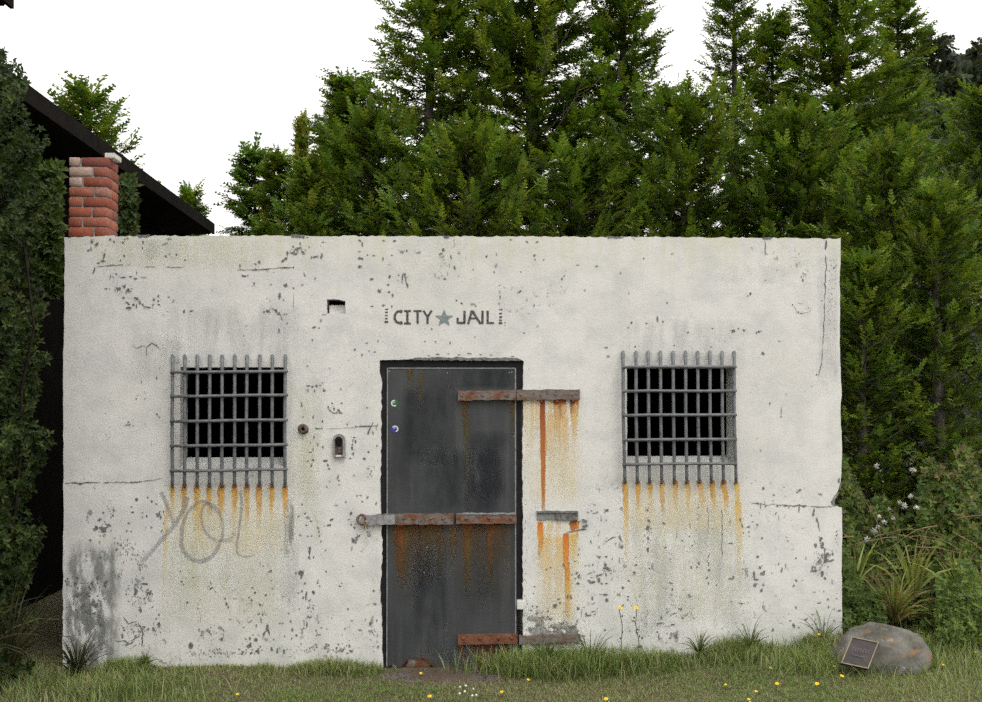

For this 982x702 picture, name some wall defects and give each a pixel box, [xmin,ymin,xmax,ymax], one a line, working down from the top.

crack [818,240,827,377]
corrosion [532,399,579,499]
crack [65,477,160,485]
peeling [65,497,164,647]
corrosion [165,484,288,529]
corrosion [395,524,507,570]
corrosion [537,520,586,605]
corrosion [622,480,742,525]
peeling [728,556,797,611]
crack [751,502,831,560]
peeling [789,529,841,632]